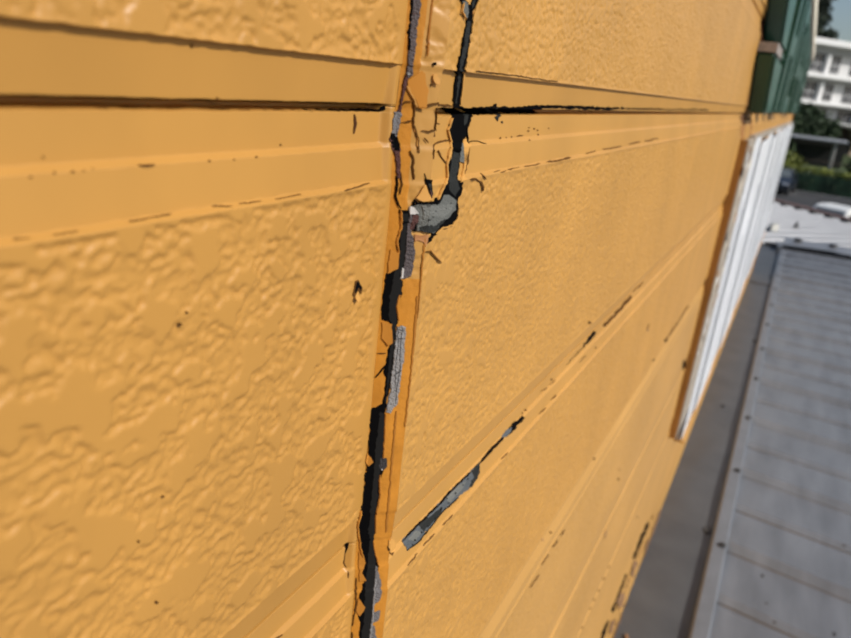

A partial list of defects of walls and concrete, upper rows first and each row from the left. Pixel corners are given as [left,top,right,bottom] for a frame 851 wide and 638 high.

spalling [388,0,451,279]
crack [299,0,707,263]
peeling [381,322,393,346]
crack [375,328,403,404]
peeling [402,455,487,566]
crack [350,578,358,638]